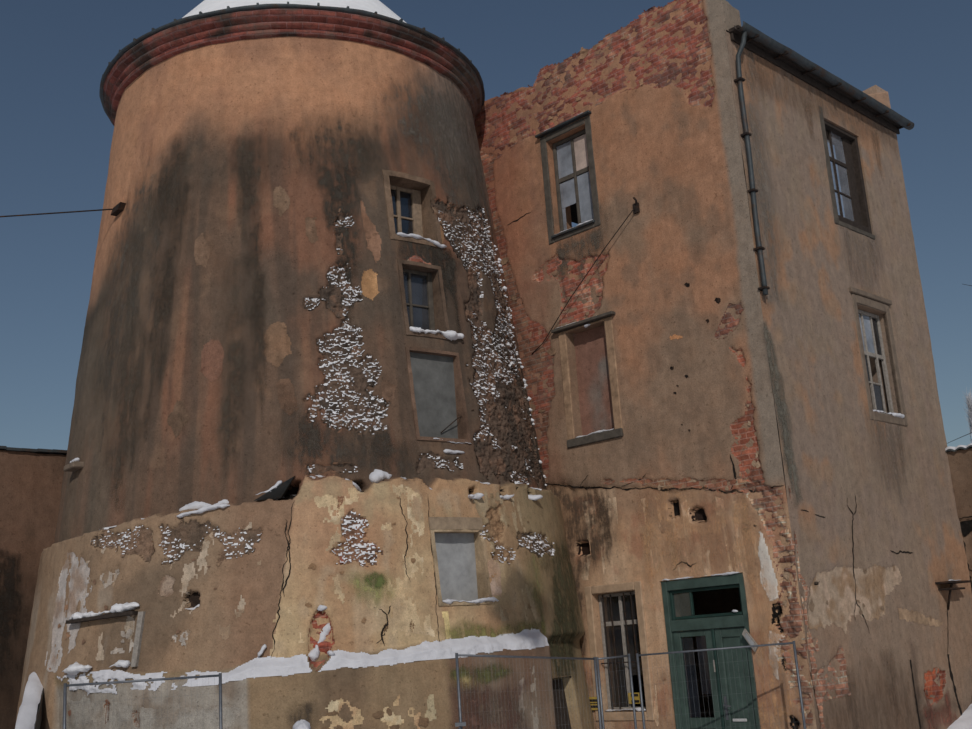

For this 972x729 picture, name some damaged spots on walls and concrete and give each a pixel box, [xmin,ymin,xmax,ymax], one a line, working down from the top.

spalling [304,201,391,435]
leakage [399,241,461,333]
spalling [430,0,715,625]
peeling [45,552,120,673]
spalling [90,518,263,618]
crack [271,502,294,656]
spalling [298,603,335,671]
spalling [307,463,383,604]
crack [377,606,391,646]
flaking render [601,298,902,729]
crack [847,496,870,634]
crack [947,610,972,715]